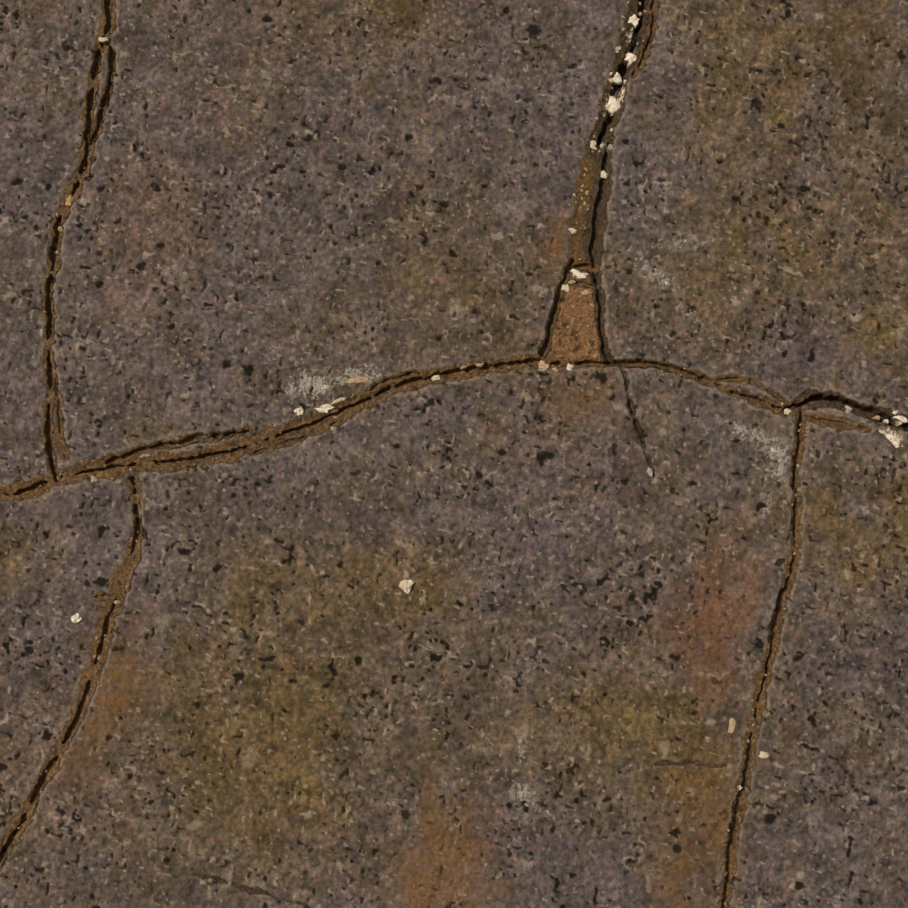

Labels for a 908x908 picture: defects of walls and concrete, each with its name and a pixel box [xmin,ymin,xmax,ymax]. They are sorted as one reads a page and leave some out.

crack [0,0,659,502]
crack [0,474,144,870]
crack [194,871,310,908]
crack [617,358,908,908]